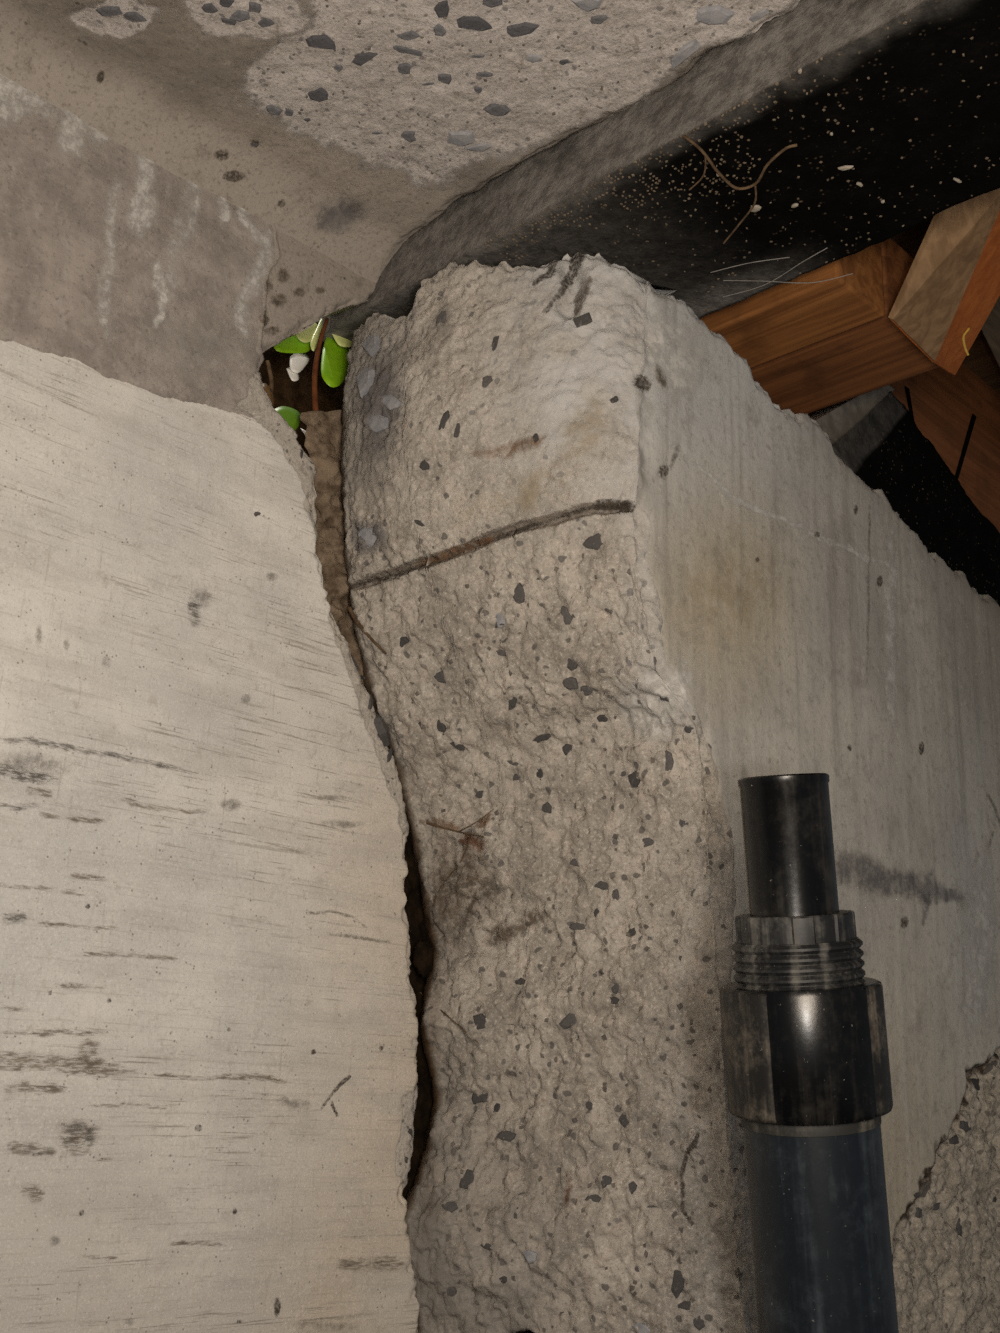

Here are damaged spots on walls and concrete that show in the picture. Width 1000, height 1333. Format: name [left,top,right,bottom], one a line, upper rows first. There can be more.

water stain [634,317,717,401]
crack [300,410,635,688]
water stain [620,657,699,741]
water stain [694,463,901,738]
crack [322,1076,351,1116]
crack [402,834,433,1200]
water stain [838,853,999,1030]
spalling [892,1047,1000,1333]